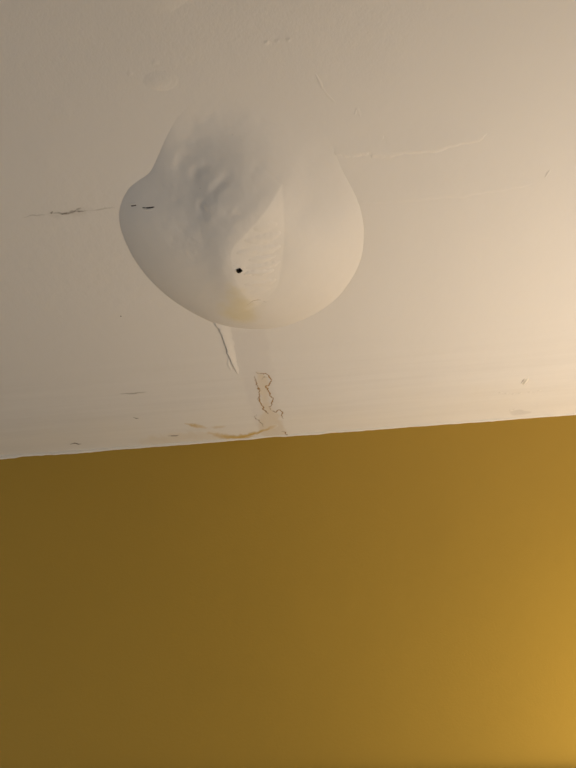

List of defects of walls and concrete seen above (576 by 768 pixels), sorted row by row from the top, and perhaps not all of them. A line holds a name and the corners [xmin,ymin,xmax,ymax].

crack [43,205,97,221]
damp [231,327,290,437]